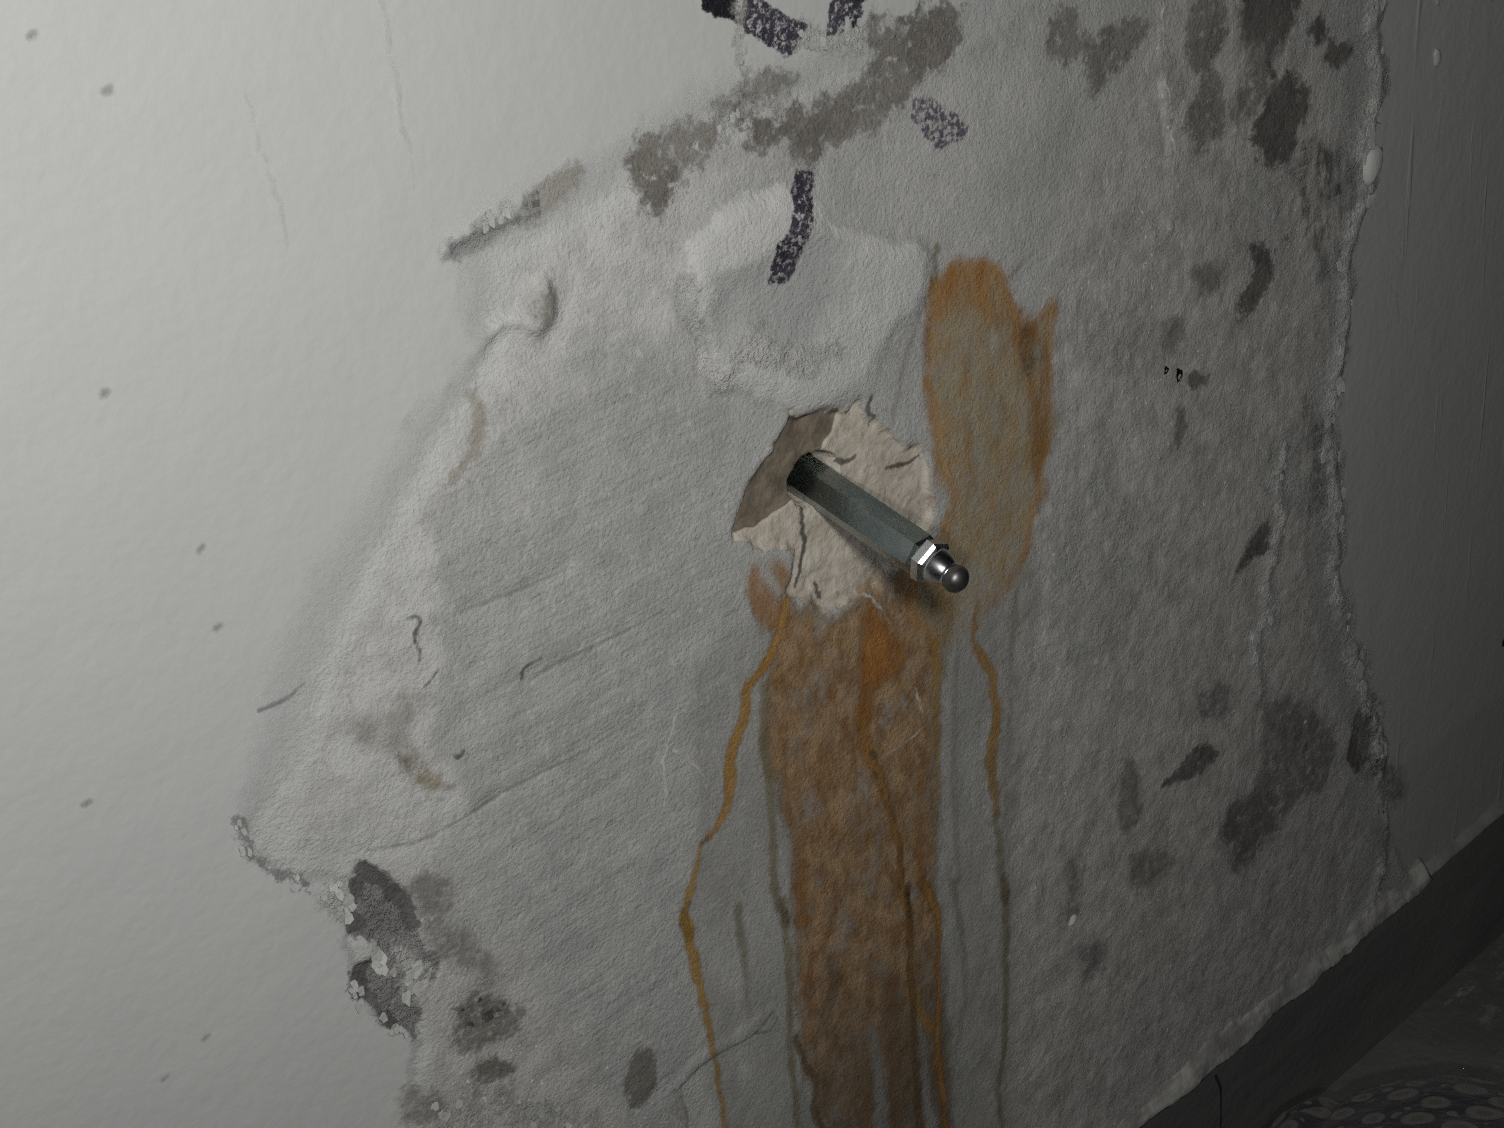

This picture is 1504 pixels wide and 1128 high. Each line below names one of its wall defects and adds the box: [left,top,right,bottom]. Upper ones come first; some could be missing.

leakage [723,0,962,164]
leakage [1185,0,1353,169]
leakage [625,121,718,216]
leakage [1237,242,1275,322]
peeling [232,0,1409,1128]
corrosion [680,260,1057,1128]
leakage [453,991,525,1083]